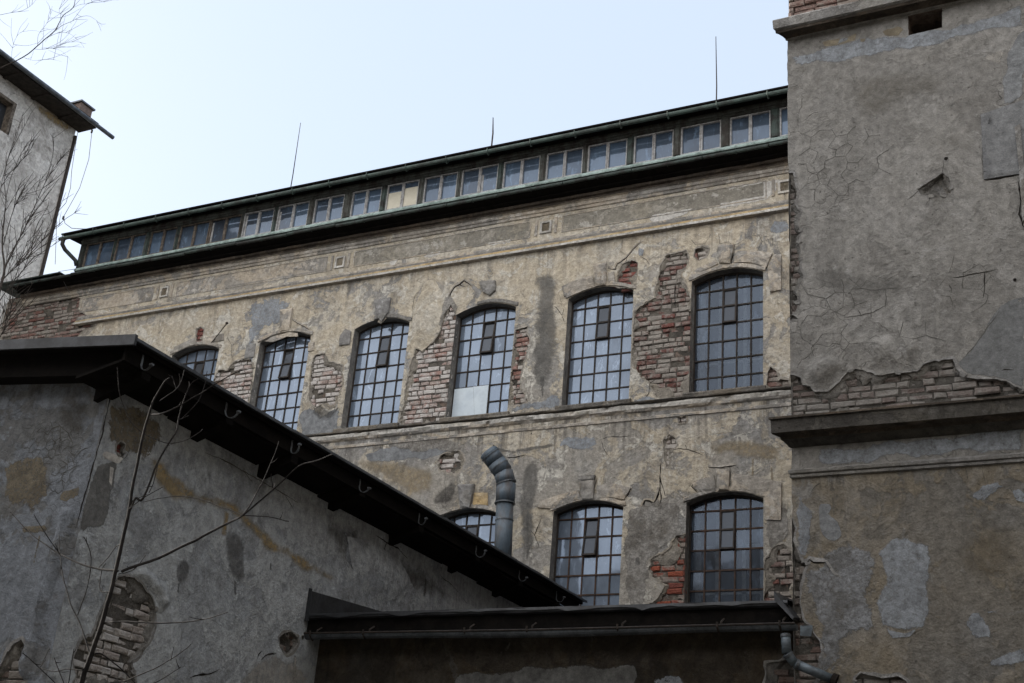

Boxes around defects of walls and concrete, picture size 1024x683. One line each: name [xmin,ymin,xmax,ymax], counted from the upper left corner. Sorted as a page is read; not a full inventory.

crack [784,126,890,201]
crack [981,158,1024,227]
flaking render [393,295,466,477]
damp [534,277,556,396]
flaking render [631,245,710,399]
crack [801,278,944,365]
flaking render [766,356,1024,415]
crack [941,256,1000,355]
crack [621,445,738,531]
flaking render [72,573,159,683]
damp [228,535,244,595]
peeling [762,497,930,683]